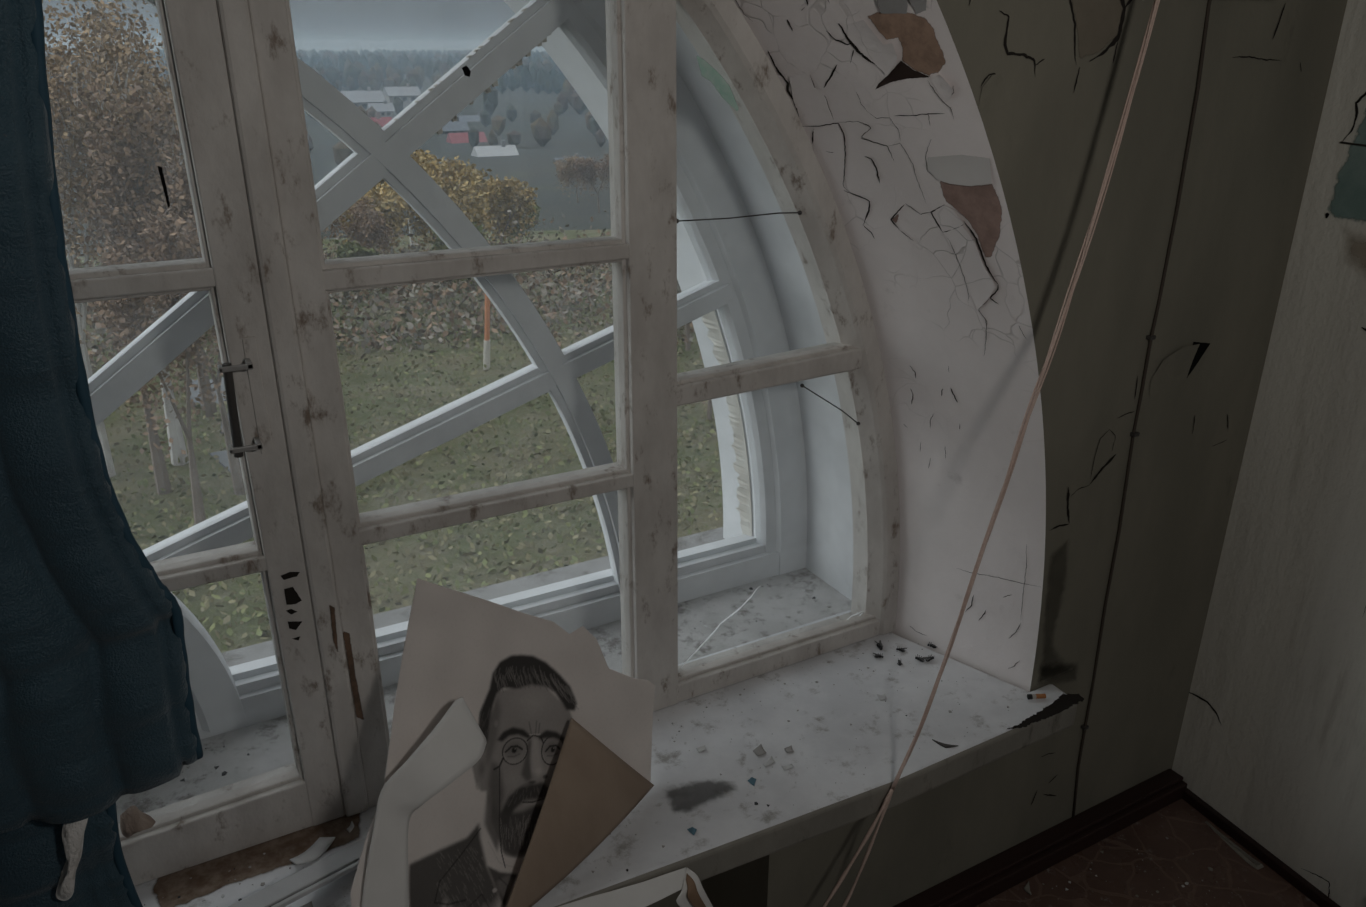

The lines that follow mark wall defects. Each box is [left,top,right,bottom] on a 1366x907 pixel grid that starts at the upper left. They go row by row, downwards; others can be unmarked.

peeling [842,0,953,103]
crack [1233,3,1301,67]
peeling [789,75,845,186]
crack [768,0,1132,355]
peeling [927,155,1002,310]
crack [961,377,1138,669]
peeling [281,572,302,640]